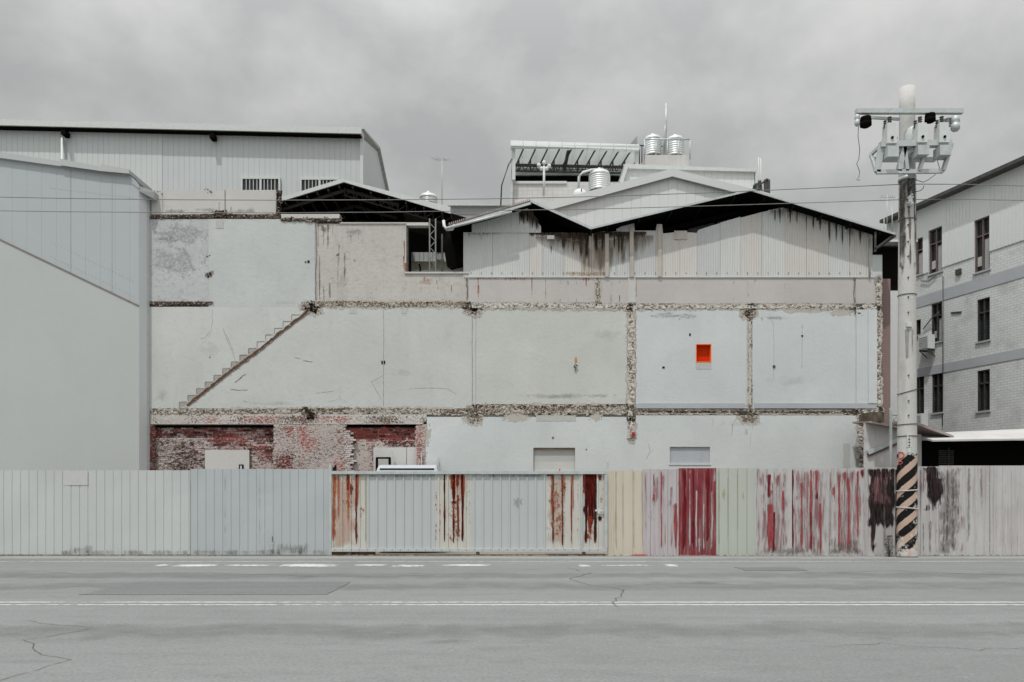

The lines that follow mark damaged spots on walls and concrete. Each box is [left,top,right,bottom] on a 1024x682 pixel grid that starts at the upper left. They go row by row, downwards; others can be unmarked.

leakage [519,210,649,265]
spalling [149,274,884,554]
corrosion [332,474,364,545]
corrosion [435,474,470,542]
corrosion [546,474,603,546]
leakage [868,468,897,551]
leakage [920,466,970,553]